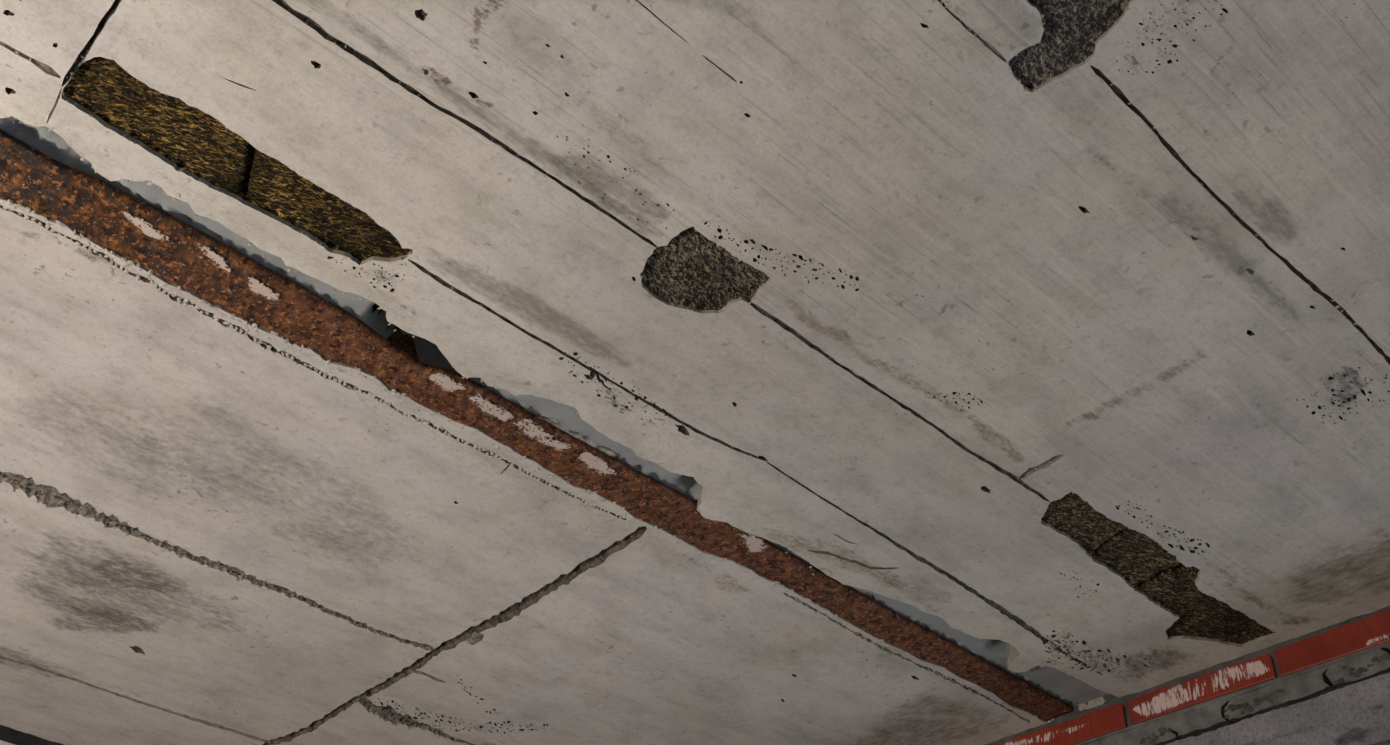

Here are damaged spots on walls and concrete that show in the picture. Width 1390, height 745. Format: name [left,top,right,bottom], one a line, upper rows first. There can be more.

rust [470,0,503,49]
crack [635,0,737,82]
crack [938,0,1006,62]
spalling [1006,0,1134,92]
spalling [60,57,413,265]
crack [0,205,630,522]
spalling [0,115,705,508]
spalling [0,198,1054,723]
crack [0,471,446,683]
crack [357,697,463,743]
spalling [838,575,1110,711]
spalling [1041,492,1280,648]